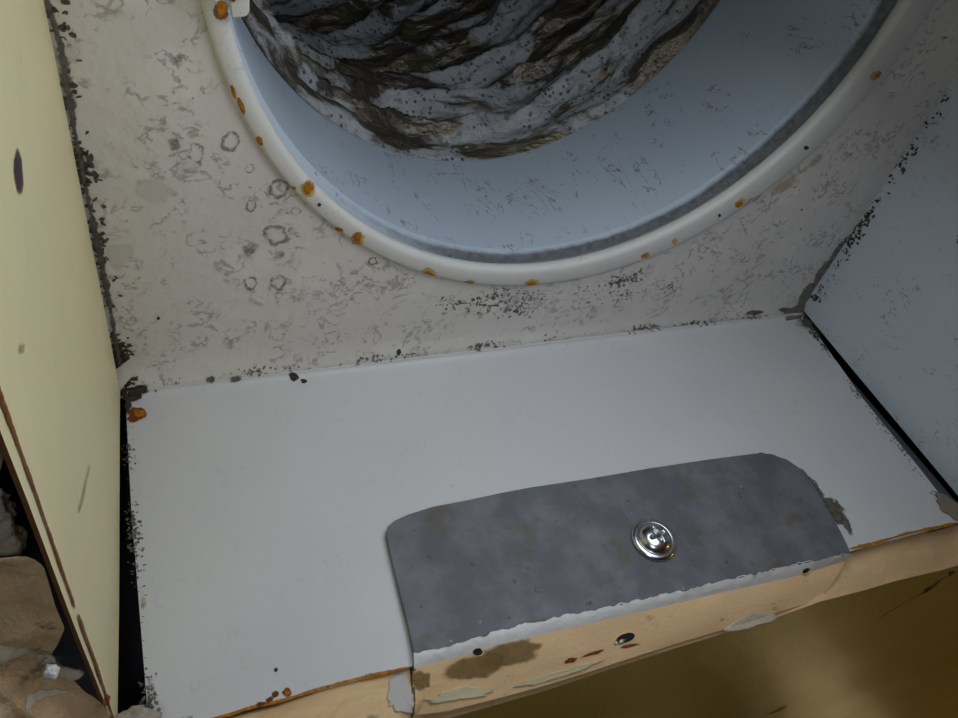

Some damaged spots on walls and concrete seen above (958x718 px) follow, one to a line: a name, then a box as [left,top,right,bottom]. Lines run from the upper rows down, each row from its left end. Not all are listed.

rust [213,0,236,20]
rust [230,85,245,115]
water stain [44,0,134,369]
rust [290,180,314,197]
rust [335,227,364,245]
water stain [435,285,552,319]
water stain [572,268,678,307]
water stain [120,374,148,480]
water stain [124,501,146,596]
water stain [138,657,161,711]
rust [213,667,408,718]